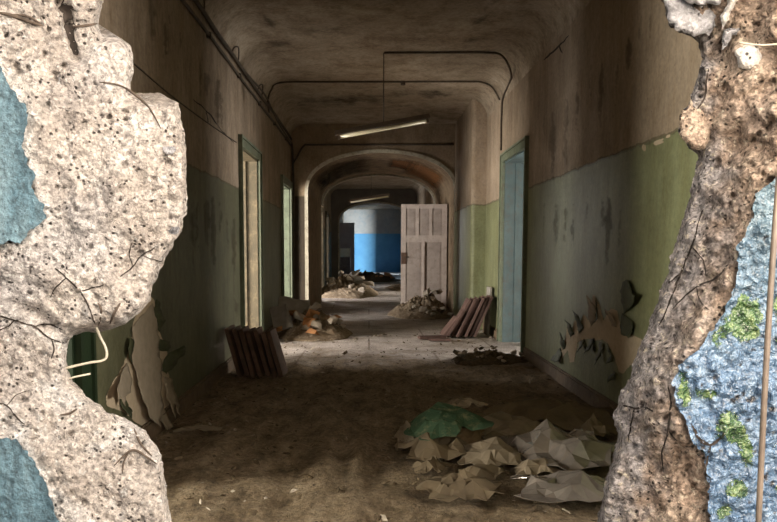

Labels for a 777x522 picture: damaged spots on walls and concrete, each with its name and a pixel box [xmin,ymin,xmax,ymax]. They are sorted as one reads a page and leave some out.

crack [50,268,103,323]
spalling [0,0,188,522]
crack [120,243,162,277]
spalling [550,0,777,522]
crack [658,210,728,326]
crack [0,315,64,359]
crack [0,391,31,429]